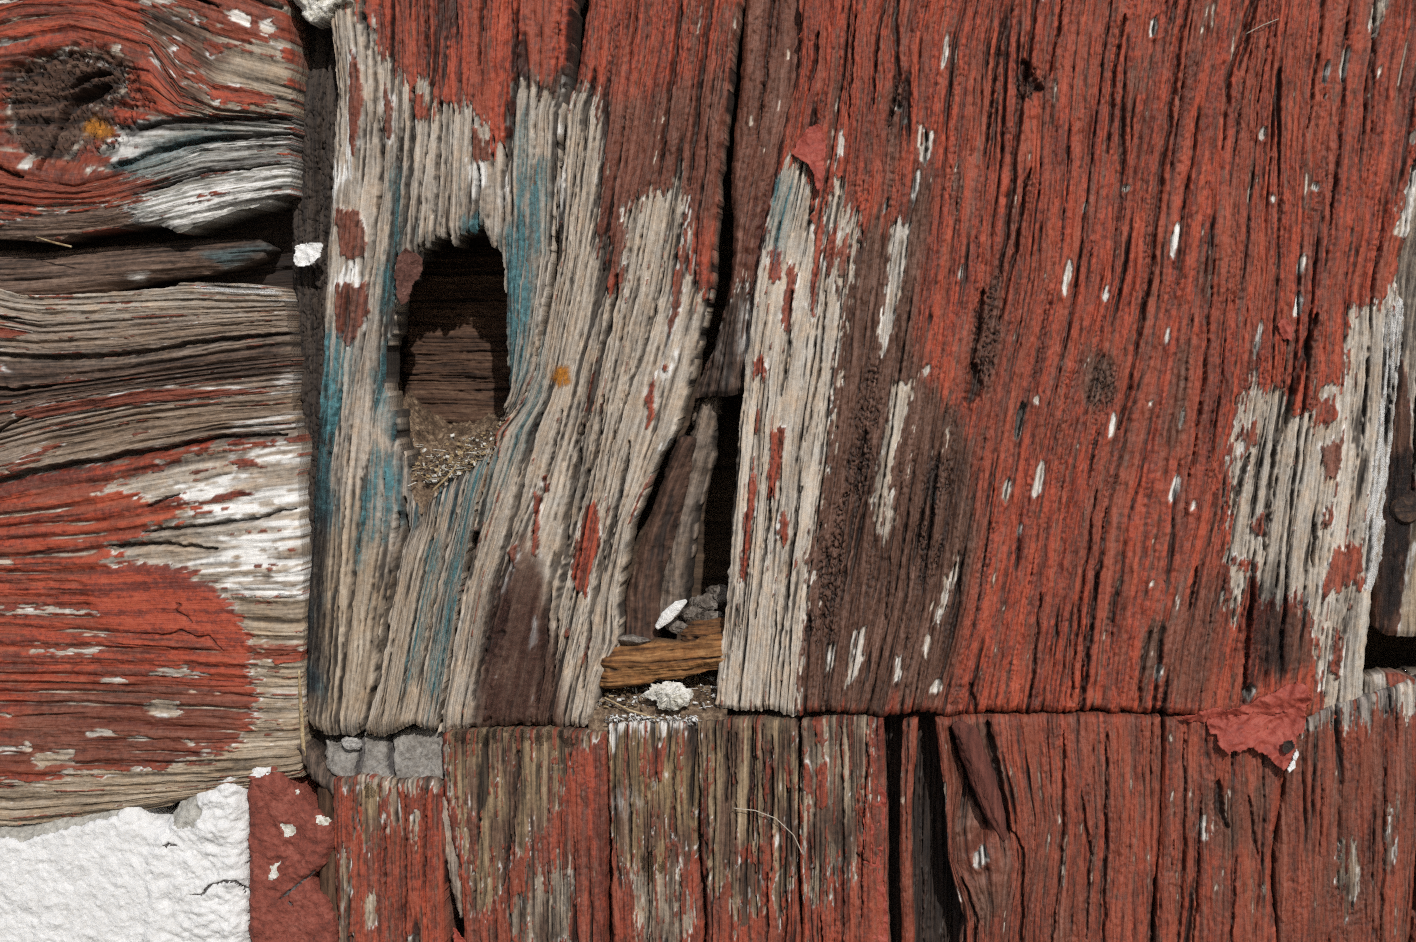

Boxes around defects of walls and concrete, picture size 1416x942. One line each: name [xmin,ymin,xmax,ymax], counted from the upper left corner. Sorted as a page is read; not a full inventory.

crack [1106,16,1126,155]
peeling [1322,47,1349,84]
peeling [1370,0,1386,35]
crack [1118,0,1190,430]
peeling [0,0,962,942]
crack [840,427,867,606]
crack [884,483,937,620]
crack [1187,566,1198,611]
peeling [1206,170,1416,773]
crack [937,491,1109,942]
crack [1137,630,1151,707]